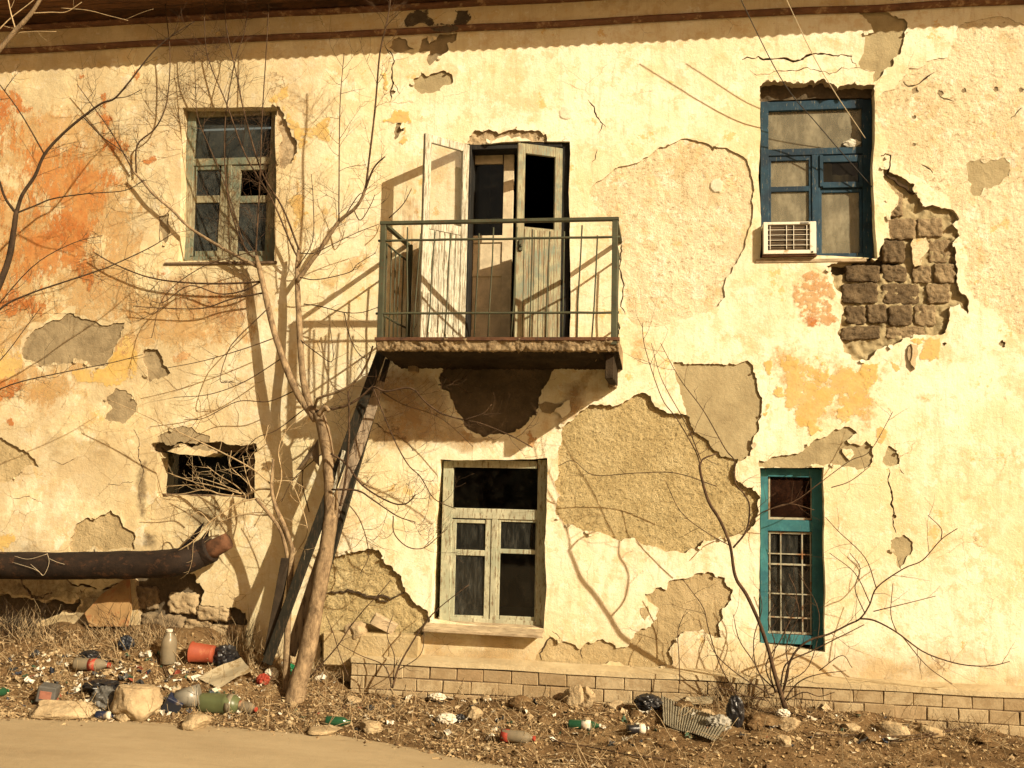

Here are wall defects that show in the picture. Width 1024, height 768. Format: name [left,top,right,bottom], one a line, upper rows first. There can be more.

peeling [389,24,458,94]
crack [743,54,852,75]
peeling [0,90,255,424]
peeling [439,12,1024,553]
peeling [70,511,136,552]
crack [888,470,902,532]
peeling [890,535,912,568]
peeling [319,545,430,657]
peeling [535,572,733,668]